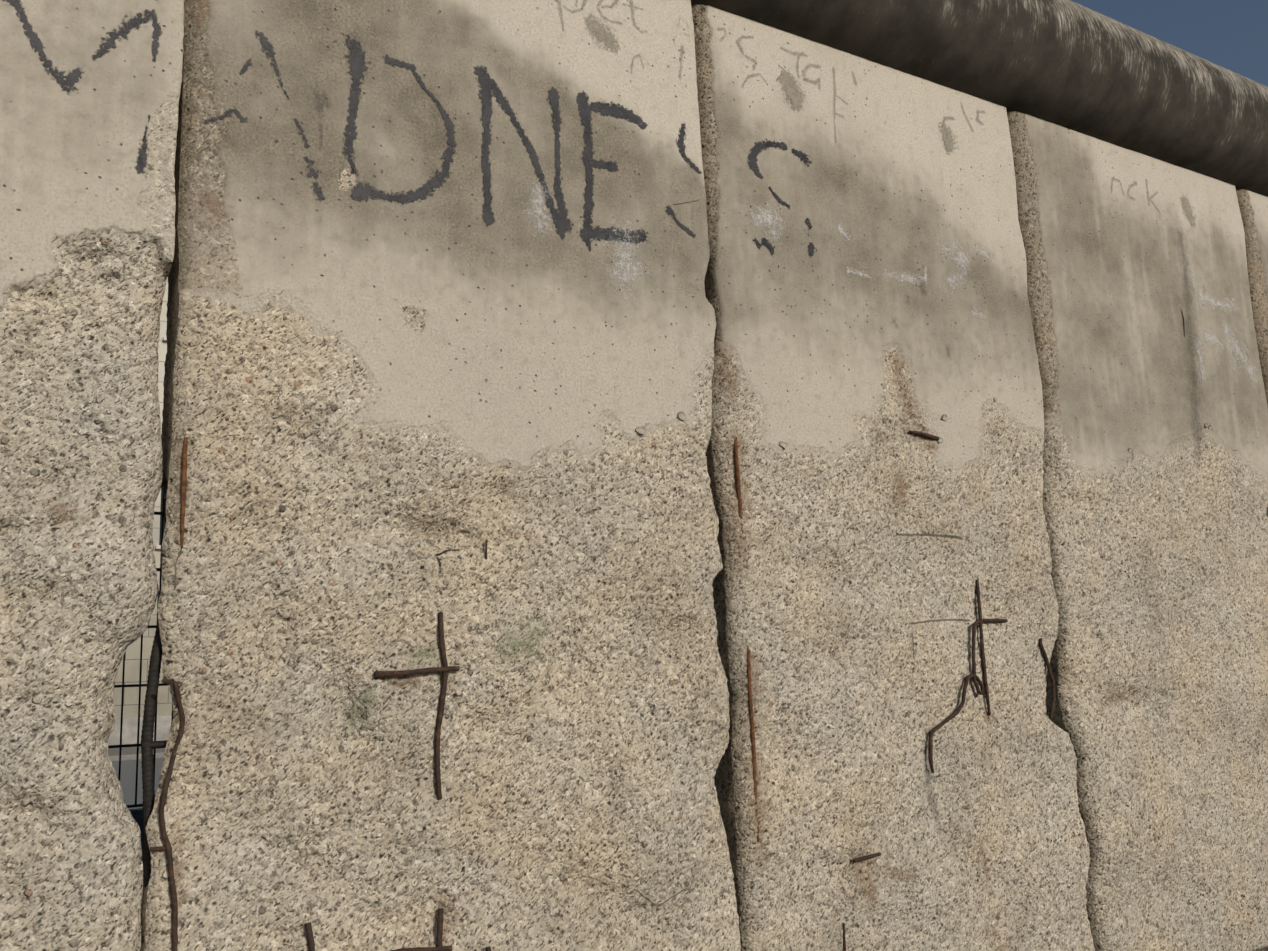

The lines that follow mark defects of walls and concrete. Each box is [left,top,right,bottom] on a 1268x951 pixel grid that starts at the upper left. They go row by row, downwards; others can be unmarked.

spalling [0,95,179,951]
crack [174,548,182,586]
corrosion [180,437,188,548]
spalling [145,0,741,951]
spalling [711,111,1268,951]
corrosion [141,622,185,951]
corrosion [374,612,460,800]
corrosion [747,649,760,843]
corrosion [928,579,1008,773]
corrosion [305,922,315,951]
corrosion [390,908,453,951]